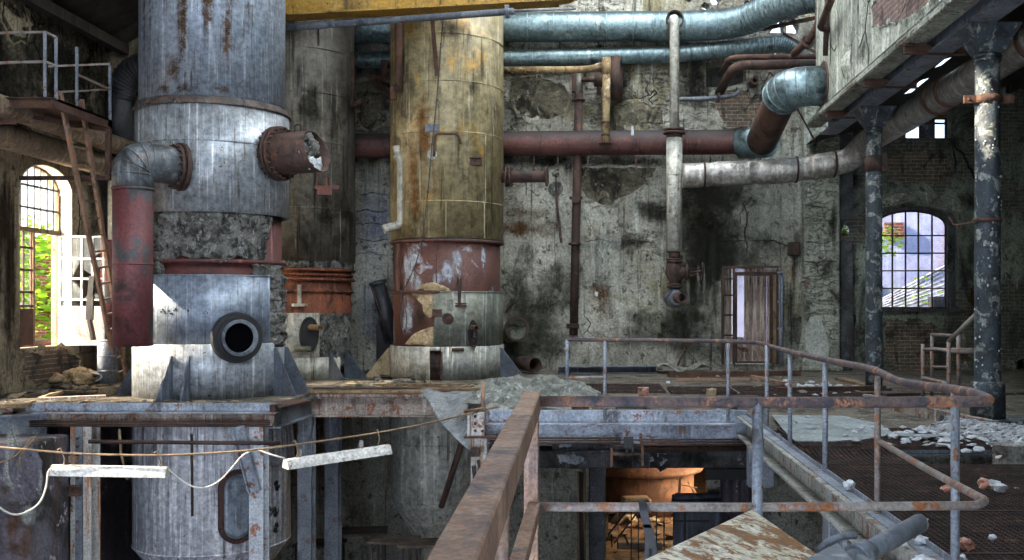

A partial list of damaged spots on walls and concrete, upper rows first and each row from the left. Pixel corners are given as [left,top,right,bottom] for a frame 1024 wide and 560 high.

corrosion [159,0,192,93]
corrosion [202,0,232,60]
flaking render [870,0,938,29]
flaking render [504,74,573,125]
corrosion [409,108,430,212]
flaking render [581,163,661,209]
peeling [405,252,421,289]
peeling [434,252,461,283]
water stain [612,236,644,255]
water stain [631,186,760,353]
water stain [788,318,800,359]